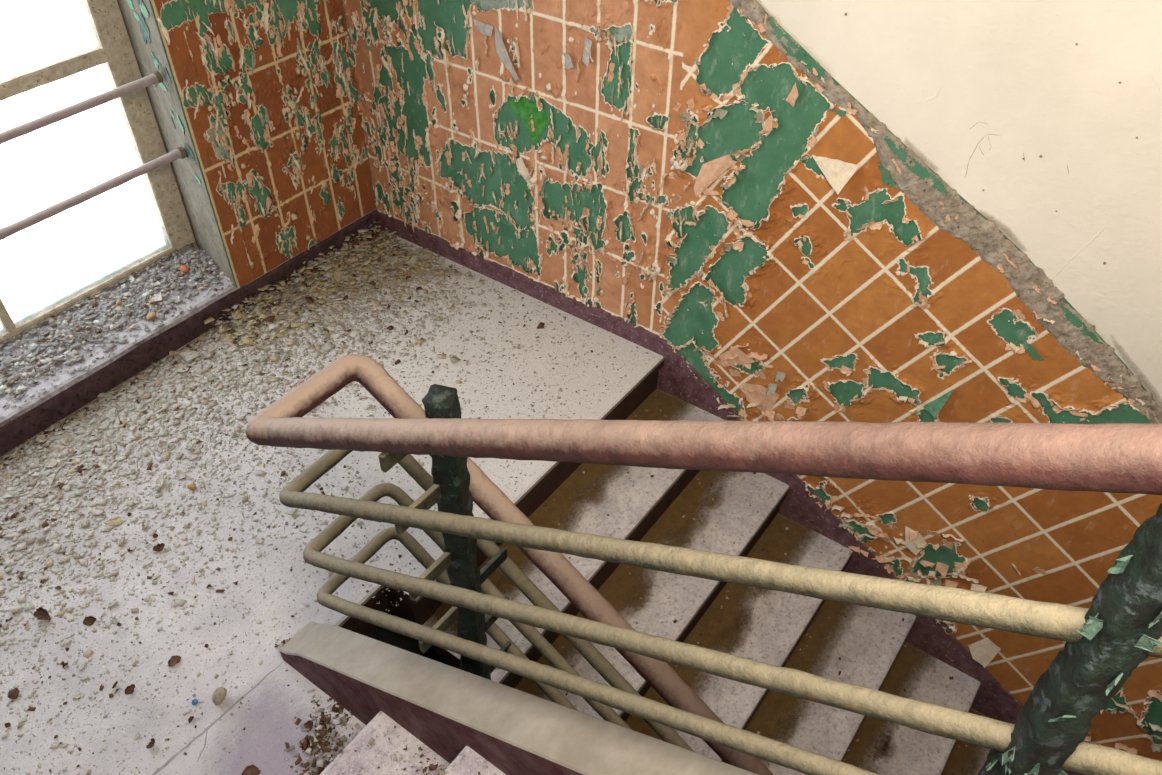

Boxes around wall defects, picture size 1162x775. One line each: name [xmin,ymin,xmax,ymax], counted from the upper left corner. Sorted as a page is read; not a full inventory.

flaking render [127,0,1162,424]
peeling [807,483,988,592]
peeling [1108,555,1134,574]
peeling [1074,613,1104,640]
peeling [1134,612,1162,652]
peeling [968,638,1001,668]
peeling [1100,673,1162,754]
peeling [986,746,1040,775]